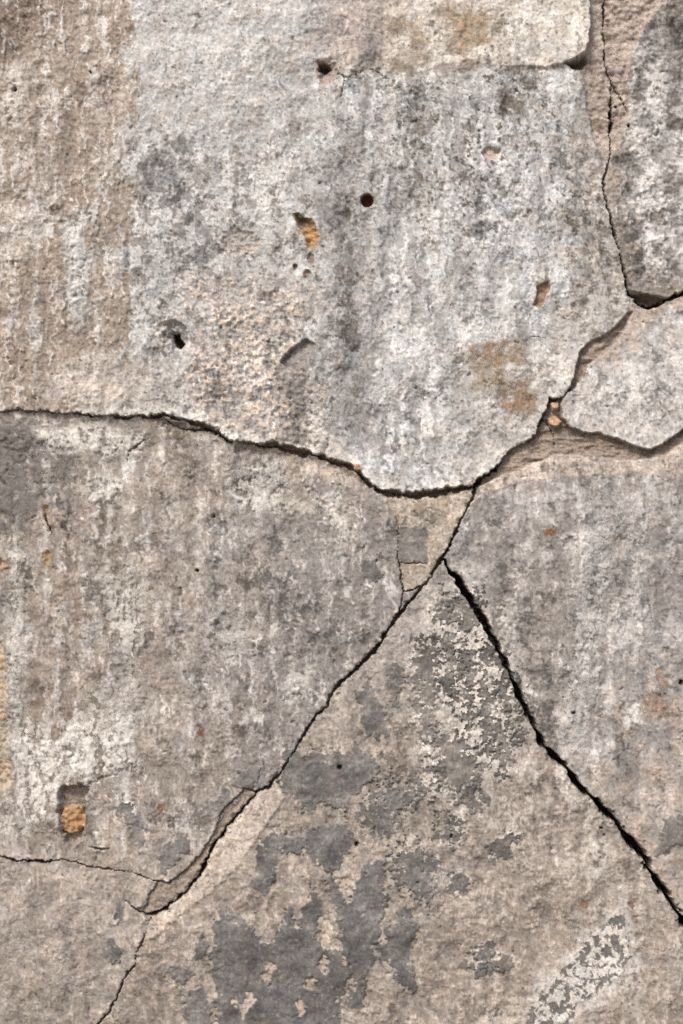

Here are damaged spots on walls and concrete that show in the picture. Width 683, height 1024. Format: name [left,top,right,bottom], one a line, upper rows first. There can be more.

crack [336,68,390,98]
crack [602,0,683,311]
peeling [361,552,385,595]
crack [0,389,683,1024]
spalling [56,782,91,849]
peeling [113,802,149,847]
peeling [166,580,533,1024]
peeling [158,831,191,875]
peeling [114,902,123,924]
peeling [103,938,122,965]